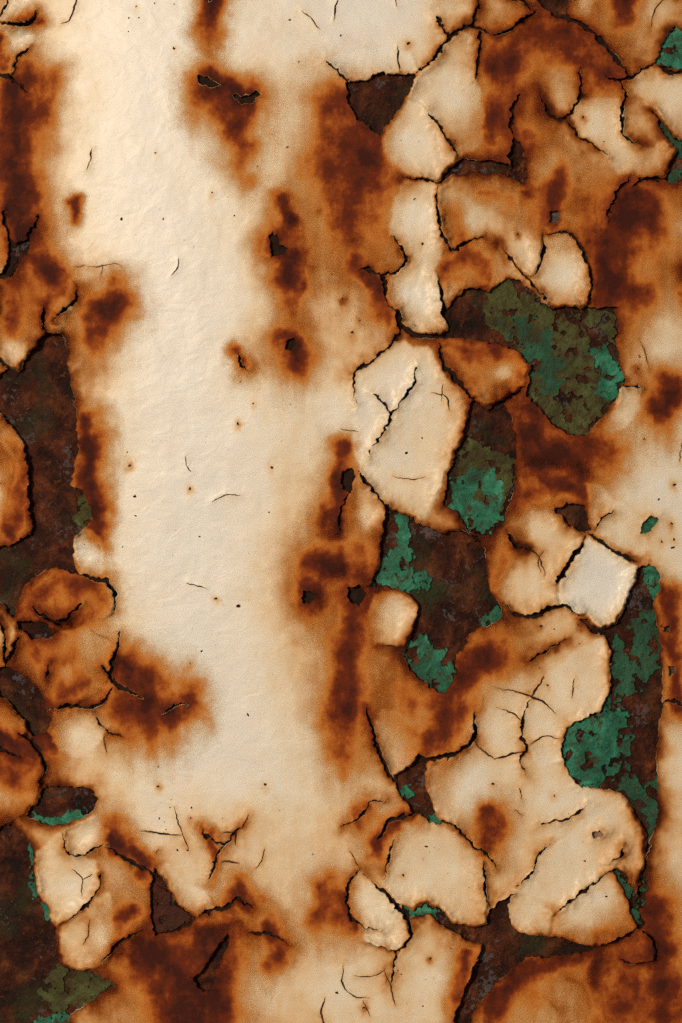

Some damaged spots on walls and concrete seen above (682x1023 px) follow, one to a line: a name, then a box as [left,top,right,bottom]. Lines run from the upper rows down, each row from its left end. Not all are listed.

rust [0,5,145,374]
rust [180,0,408,391]
crack [397,0,535,79]
peeling [326,32,642,436]
peeling [0,750,115,1023]
peeling [0,284,118,759]
rust [0,563,215,816]
crack [62,807,265,943]
rust [284,432,525,792]
crack [320,639,584,1023]
peeling [341,341,675,1023]
crack [506,512,636,619]